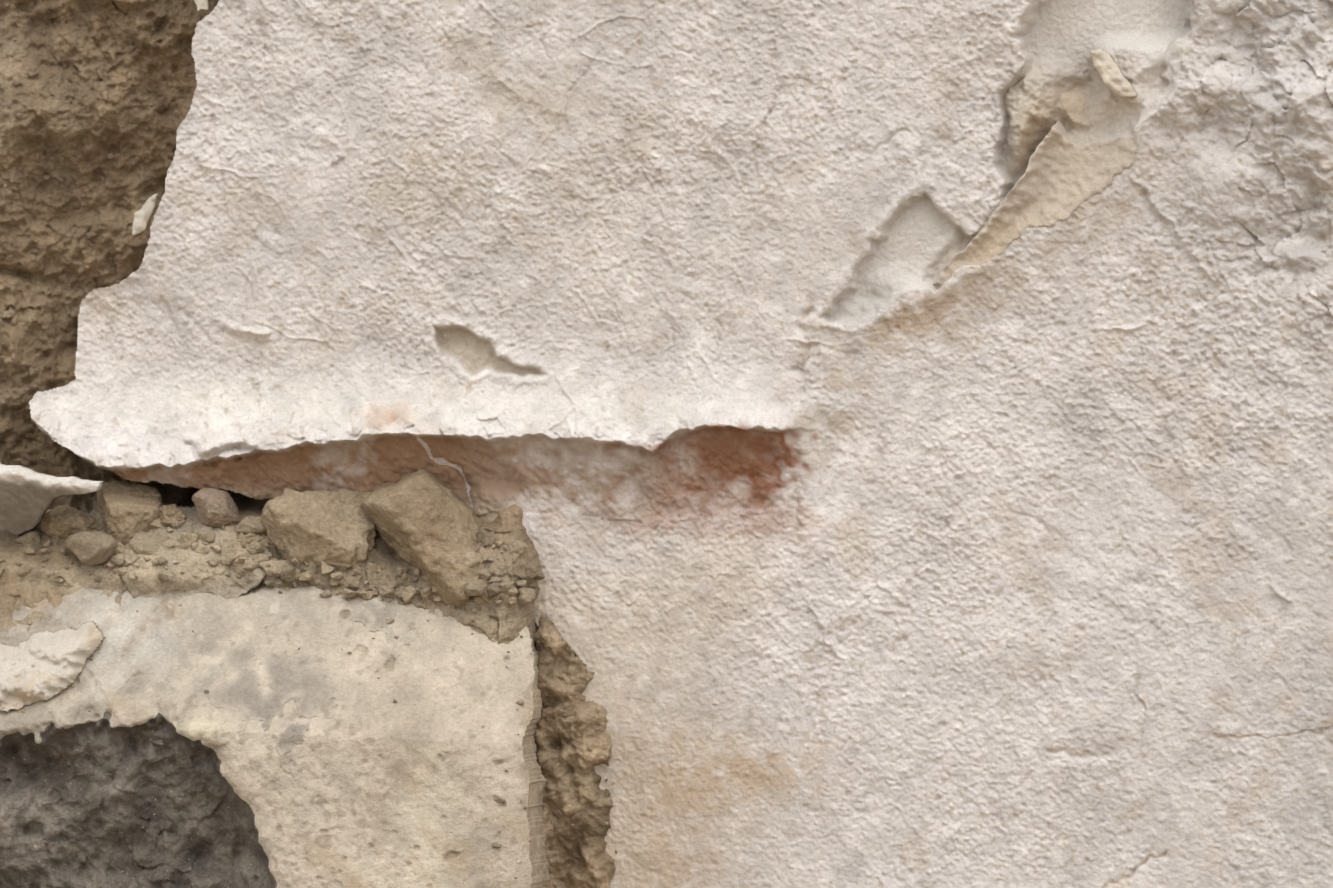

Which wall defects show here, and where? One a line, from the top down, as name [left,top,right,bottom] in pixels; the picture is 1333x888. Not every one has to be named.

spalling [820,0,1333,326]